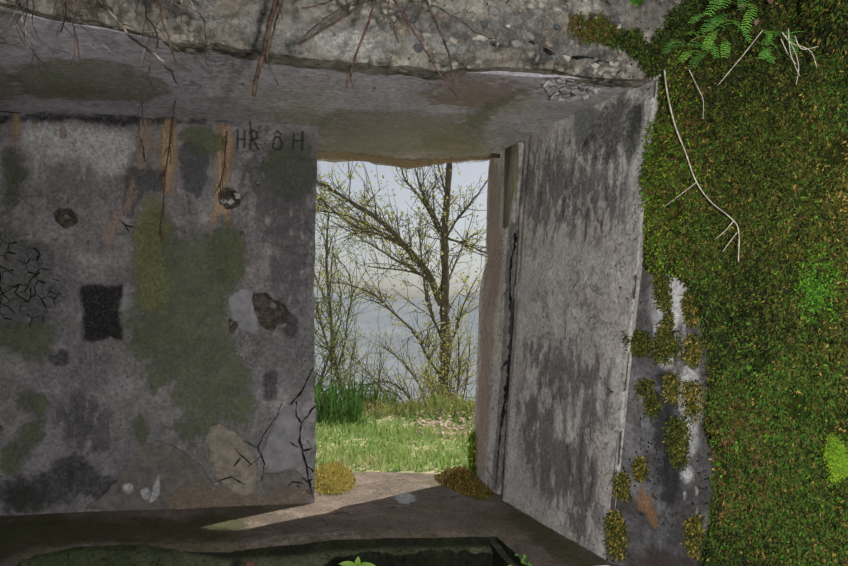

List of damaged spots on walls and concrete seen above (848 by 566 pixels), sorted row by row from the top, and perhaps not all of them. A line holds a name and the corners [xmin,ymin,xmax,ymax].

rust [138,118,177,202]
rust [210,125,234,232]
spalling [218,188,242,209]
water stain [582,93,644,162]
crack [0,232,61,327]
spalling [228,289,290,335]
crack [496,233,517,484]
crack [245,368,316,498]